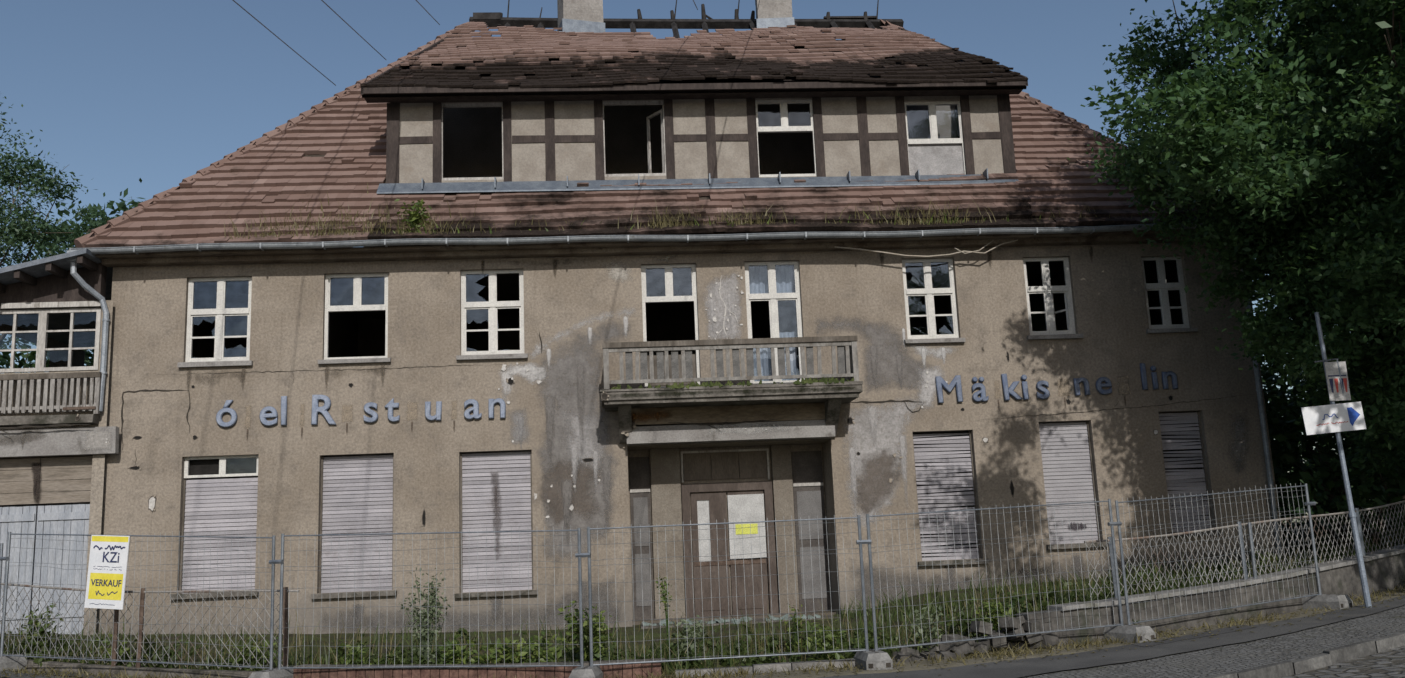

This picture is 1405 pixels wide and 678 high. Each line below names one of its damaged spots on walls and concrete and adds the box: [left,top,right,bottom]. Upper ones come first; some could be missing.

peeling [498,362,546,404]
damp [532,310,633,557]
peeling [705,274,744,339]
damp [819,320,952,525]